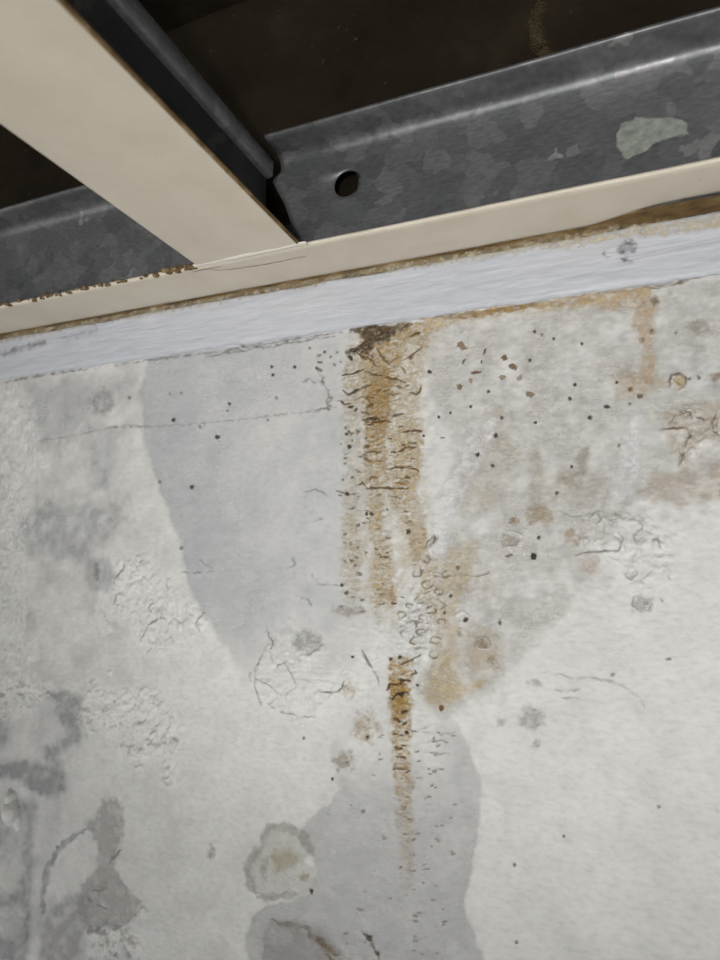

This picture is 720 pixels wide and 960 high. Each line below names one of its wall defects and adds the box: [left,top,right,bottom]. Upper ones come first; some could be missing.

leakage [142,353,212,463]
rust [341,288,658,605]
rust [387,654,421,827]